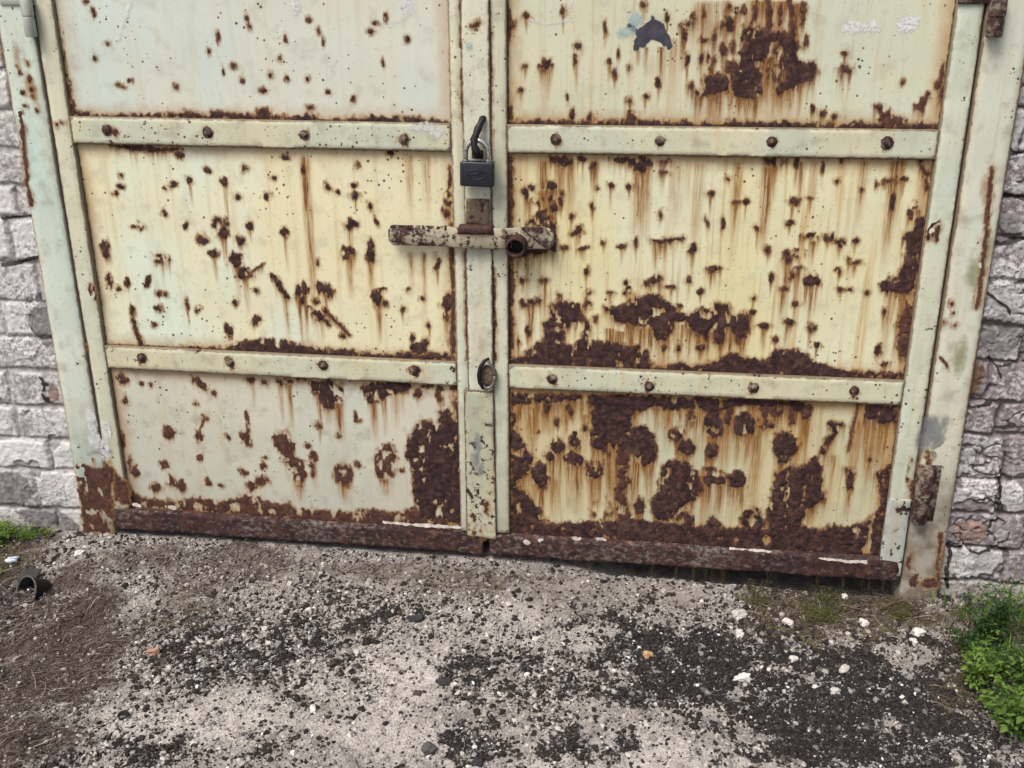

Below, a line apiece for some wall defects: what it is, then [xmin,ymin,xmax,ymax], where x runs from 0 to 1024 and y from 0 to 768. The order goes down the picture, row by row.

rust [60,32,75,112]
rust [678,0,820,114]
rust [99,239,111,261]
rust [130,316,146,346]
rust [210,215,253,290]
rust [270,157,351,337]
rust [341,217,387,330]
rust [440,165,453,227]
rust [437,247,456,355]
rust [508,156,933,556]
rust [973,166,995,310]
rust [75,333,489,537]